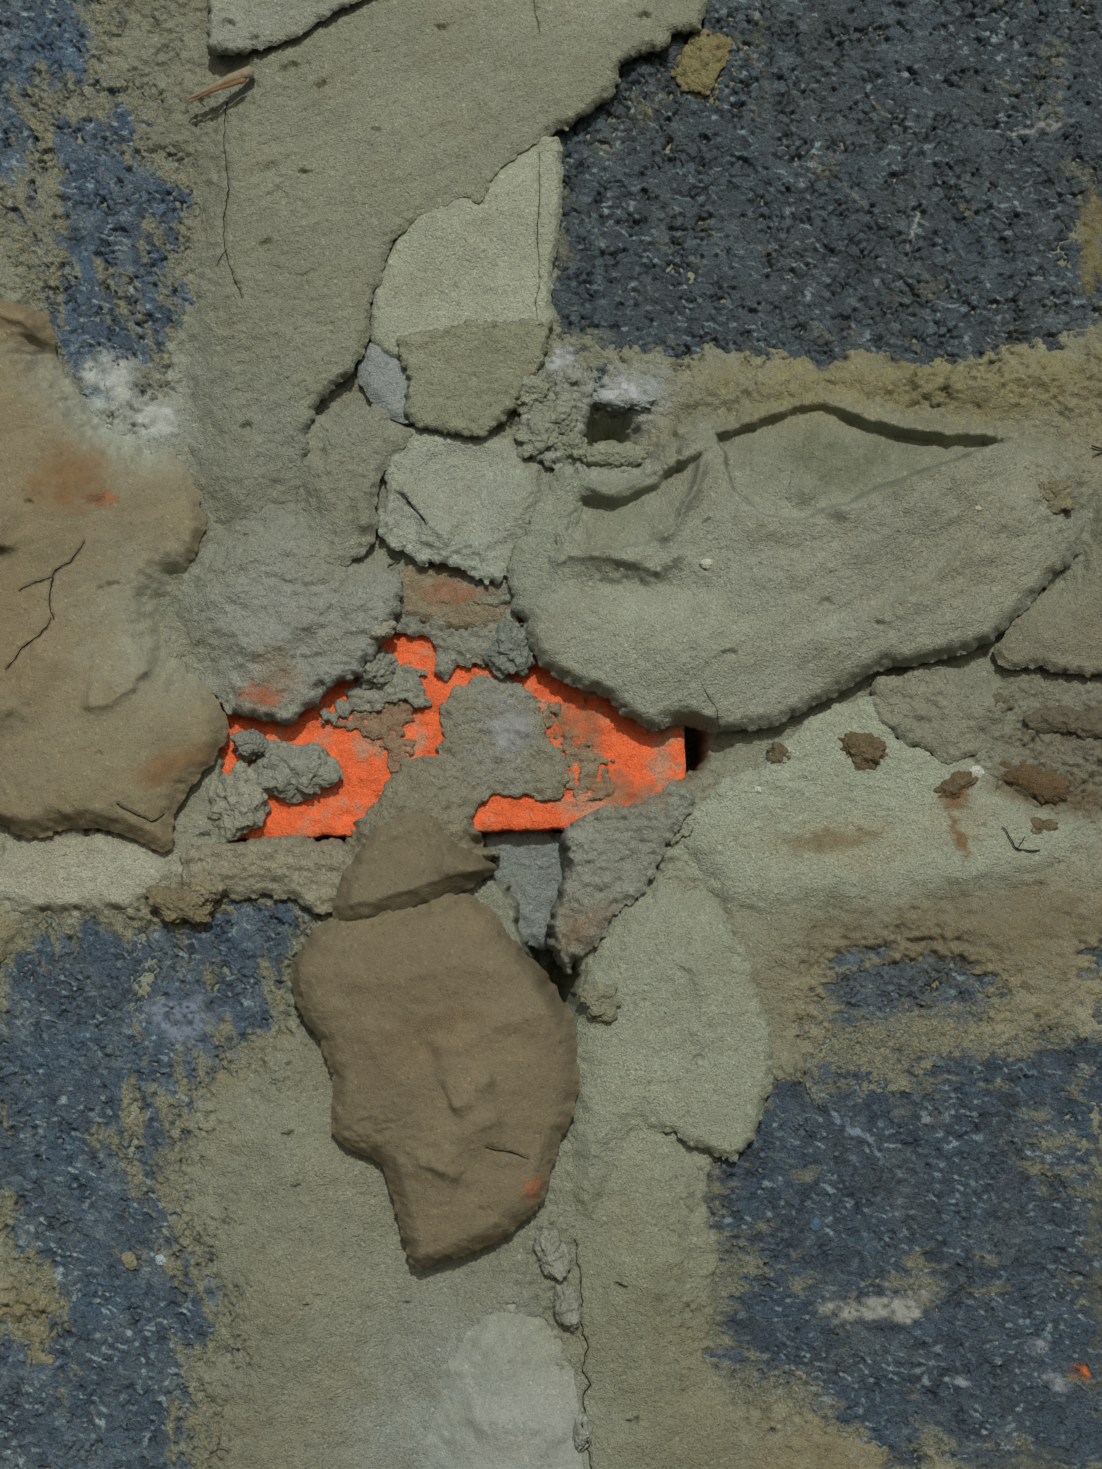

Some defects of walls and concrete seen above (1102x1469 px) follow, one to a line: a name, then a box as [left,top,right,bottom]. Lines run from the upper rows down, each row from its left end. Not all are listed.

spalling [0,0,204,430]
crack [217,99,242,297]
spalling [548,0,1102,383]
crack [5,541,85,670]
spalling [0,894,327,1469]
crack [575,1241,592,1469]
spalling [703,939,1102,1469]